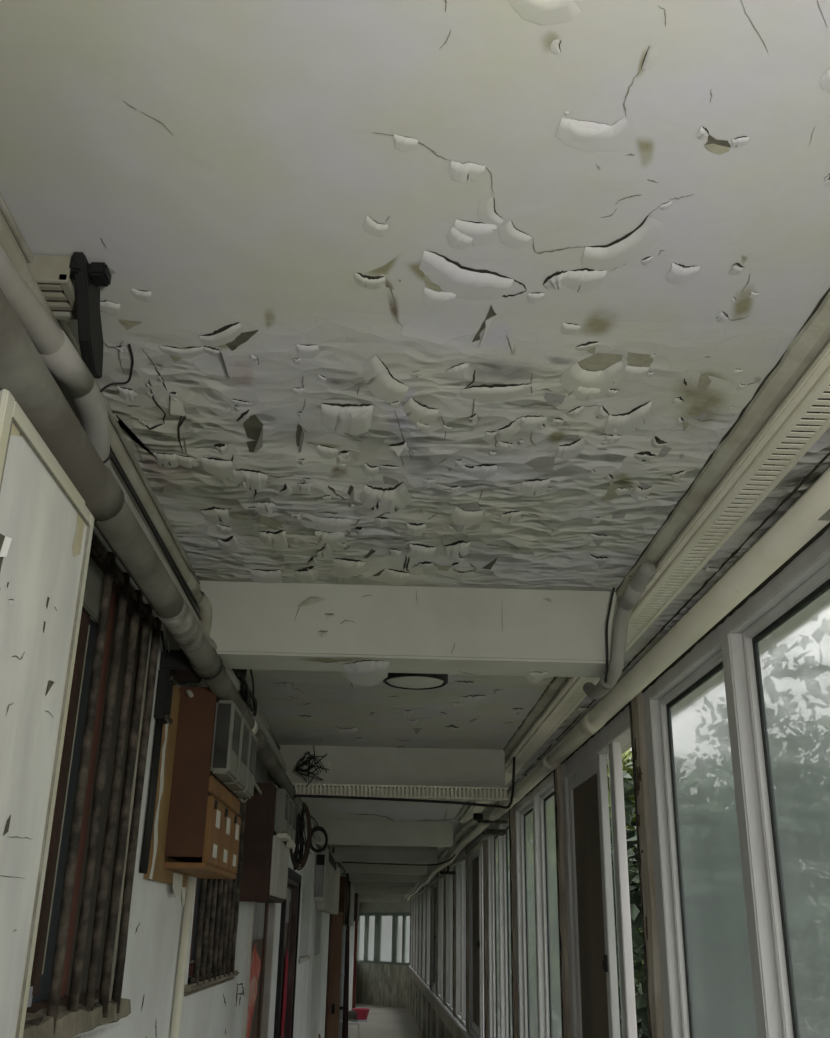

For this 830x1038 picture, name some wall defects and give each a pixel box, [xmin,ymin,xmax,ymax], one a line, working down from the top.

crack [510,0,583,26]
crack [375,133,570,254]
peeling [716,253,759,327]
peeling [100,300,142,373]
peeling [111,304,279,502]
peeling [771,455,830,499]
peeling [0,533,12,571]
peeling [735,524,773,541]
peeling [288,656,389,687]